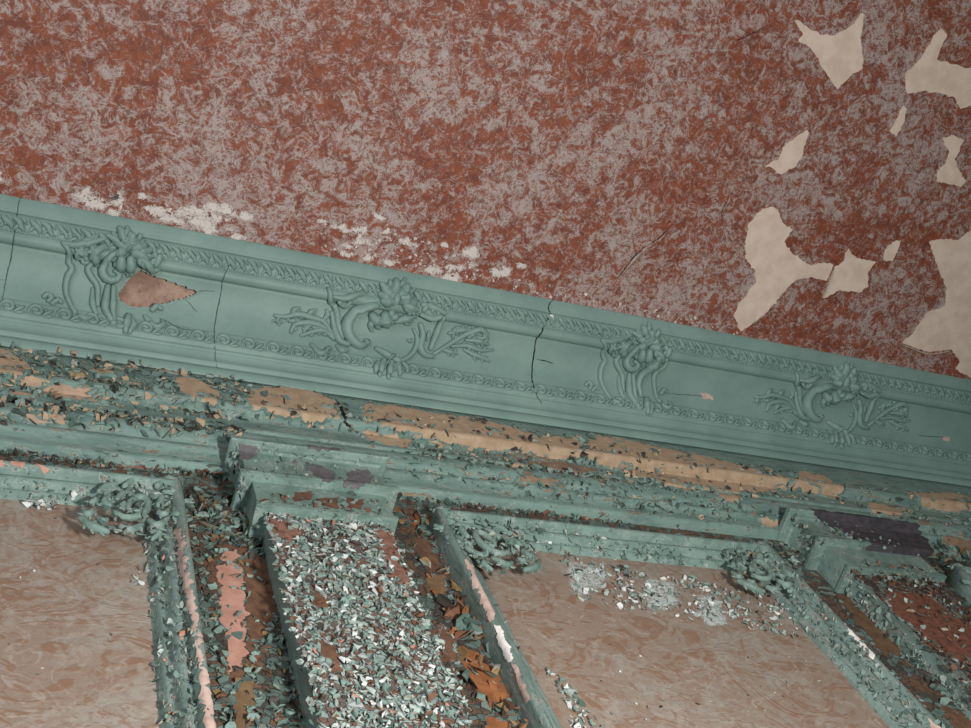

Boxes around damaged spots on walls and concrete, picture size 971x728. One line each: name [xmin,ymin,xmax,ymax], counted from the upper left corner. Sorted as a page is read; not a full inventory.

peeling [792,12,865,91]
peeling [888,26,971,138]
peeling [762,127,811,176]
peeling [934,133,967,188]
spalling [117,268,201,309]
crack [531,299,554,404]
peeling [712,204,903,335]
peeling [900,225,971,380]
peeling [0,341,971,728]